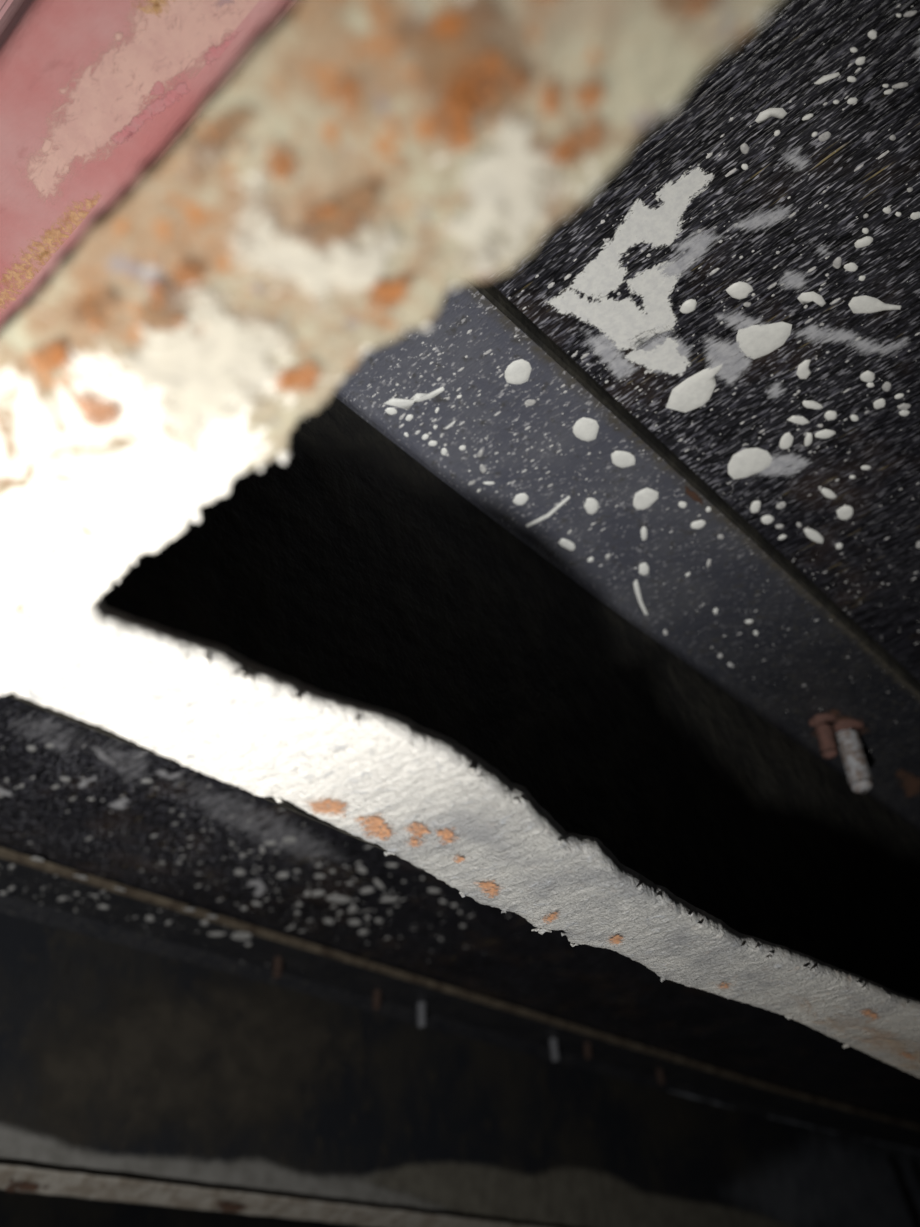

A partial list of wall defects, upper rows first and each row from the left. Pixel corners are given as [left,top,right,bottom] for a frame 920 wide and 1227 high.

corrosion [429,2,465,44]
peeling [27,0,260,200]
corrosion [427,100,479,150]
corrosion [538,78,604,164]
corrosion [296,184,378,247]
corrosion [0,196,97,308]
corrosion [136,265,202,331]
corrosion [366,280,412,312]
corrosion [28,341,72,375]
corrosion [274,363,321,392]
corrosion [310,799,465,864]